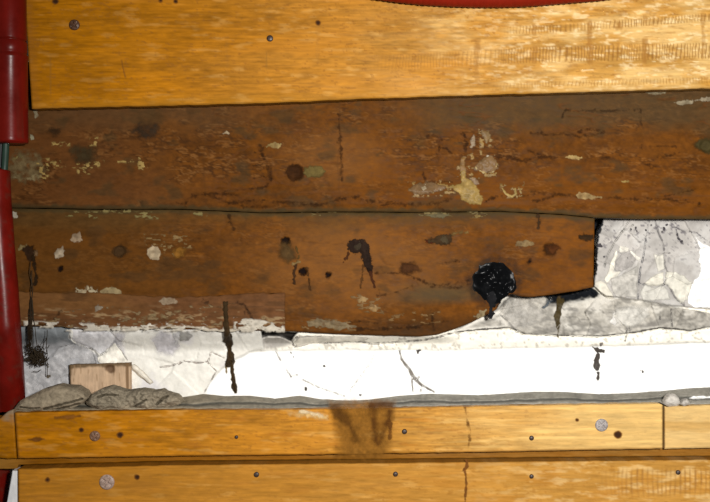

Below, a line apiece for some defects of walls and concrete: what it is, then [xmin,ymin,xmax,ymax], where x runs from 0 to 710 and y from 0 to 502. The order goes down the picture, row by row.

peeling [408,129,498,218]
peeling [500,184,523,198]
corrosion [18,245,38,286]
corrosion [343,239,376,288]
crack [545,227,705,341]
peeling [95,297,222,345]
crack [160,353,221,390]
corrosion [223,301,237,393]
peeling [234,317,284,332]
crack [292,314,525,392]
water stain [332,401,393,456]